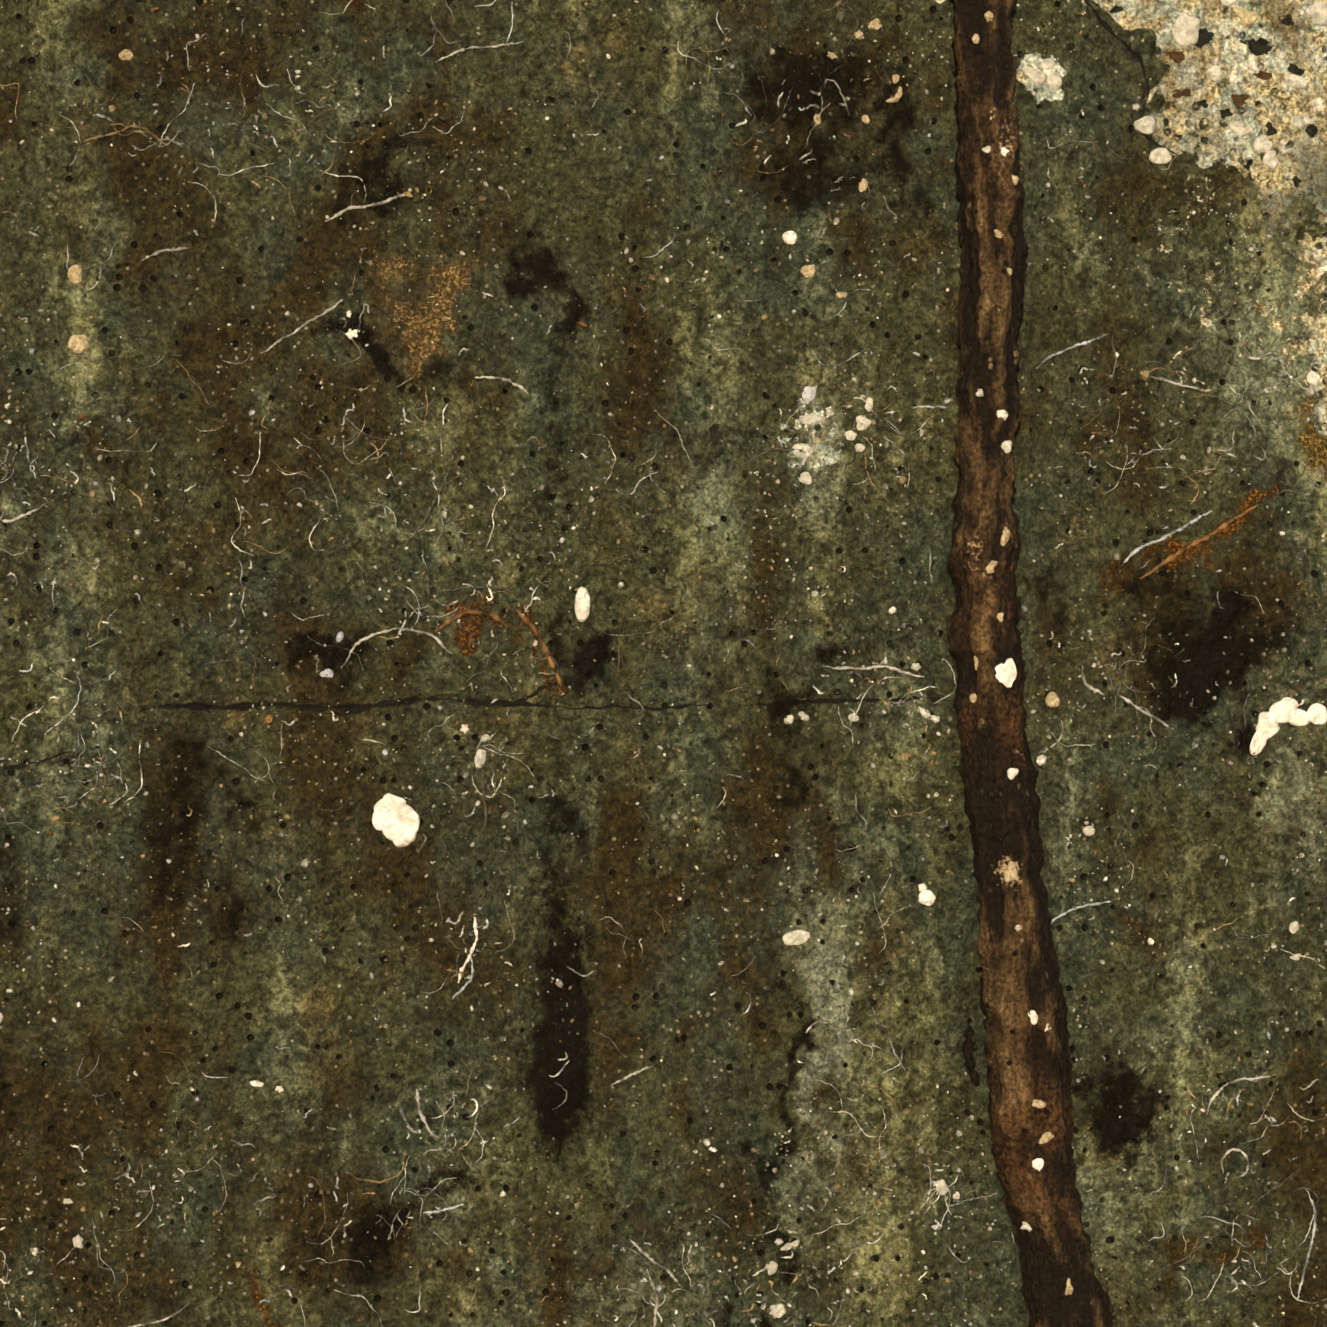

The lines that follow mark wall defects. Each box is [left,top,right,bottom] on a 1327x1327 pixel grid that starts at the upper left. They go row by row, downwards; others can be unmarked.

damp [748,48,934,230]
spalling [1013,52,1068,105]
crack [1084,0,1183,158]
spalling [1081,0,1327,447]
corrosion [1146,487,1279,571]
crack [140,682,951,715]
damp [1121,569,1299,727]
damp [1235,722,1259,757]
damp [520,795,593,1165]